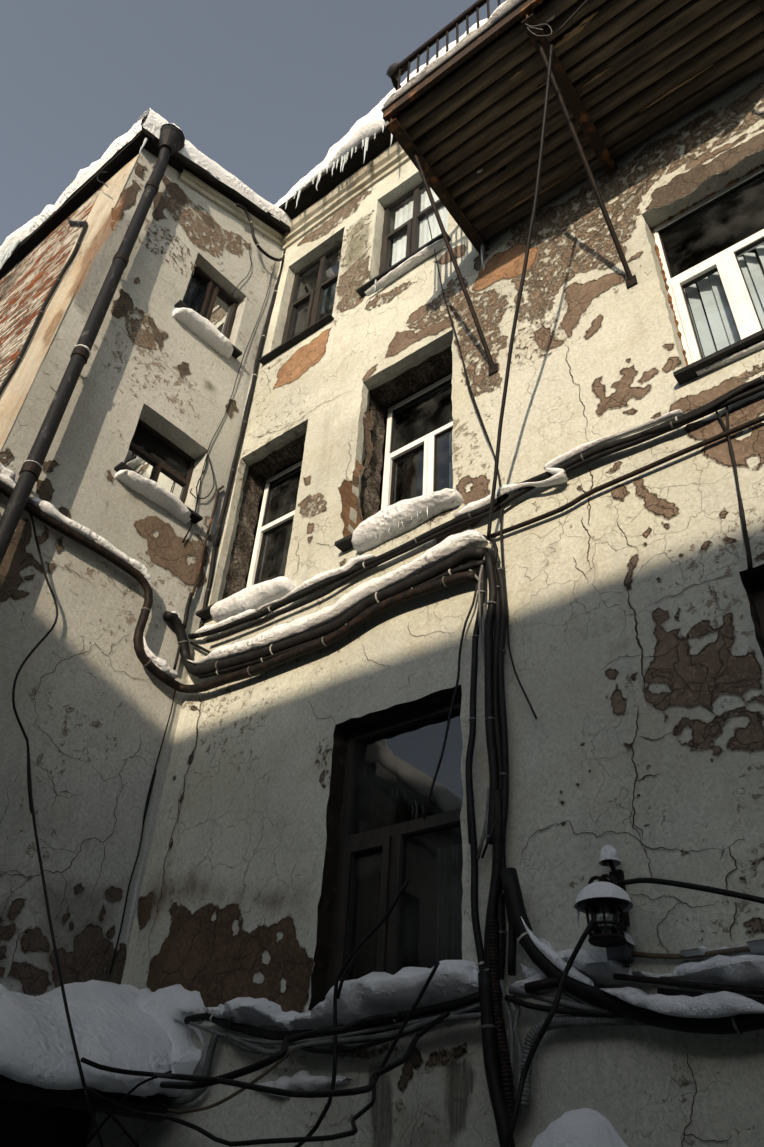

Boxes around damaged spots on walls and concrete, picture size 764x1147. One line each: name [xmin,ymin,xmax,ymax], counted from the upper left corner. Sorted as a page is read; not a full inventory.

flaking render [362,81,764,396]
crack [531,234,588,440]
flaking render [591,343,682,417]
flaking render [650,362,764,470]
crack [573,468,593,579]
flaking render [611,477,679,591]
crack [0,631,150,977]
crack [145,698,202,986]
crack [520,573,758,951]
flaking render [604,607,764,762]
flaking render [146,901,315,1013]
crack [672,1055,731,1147]